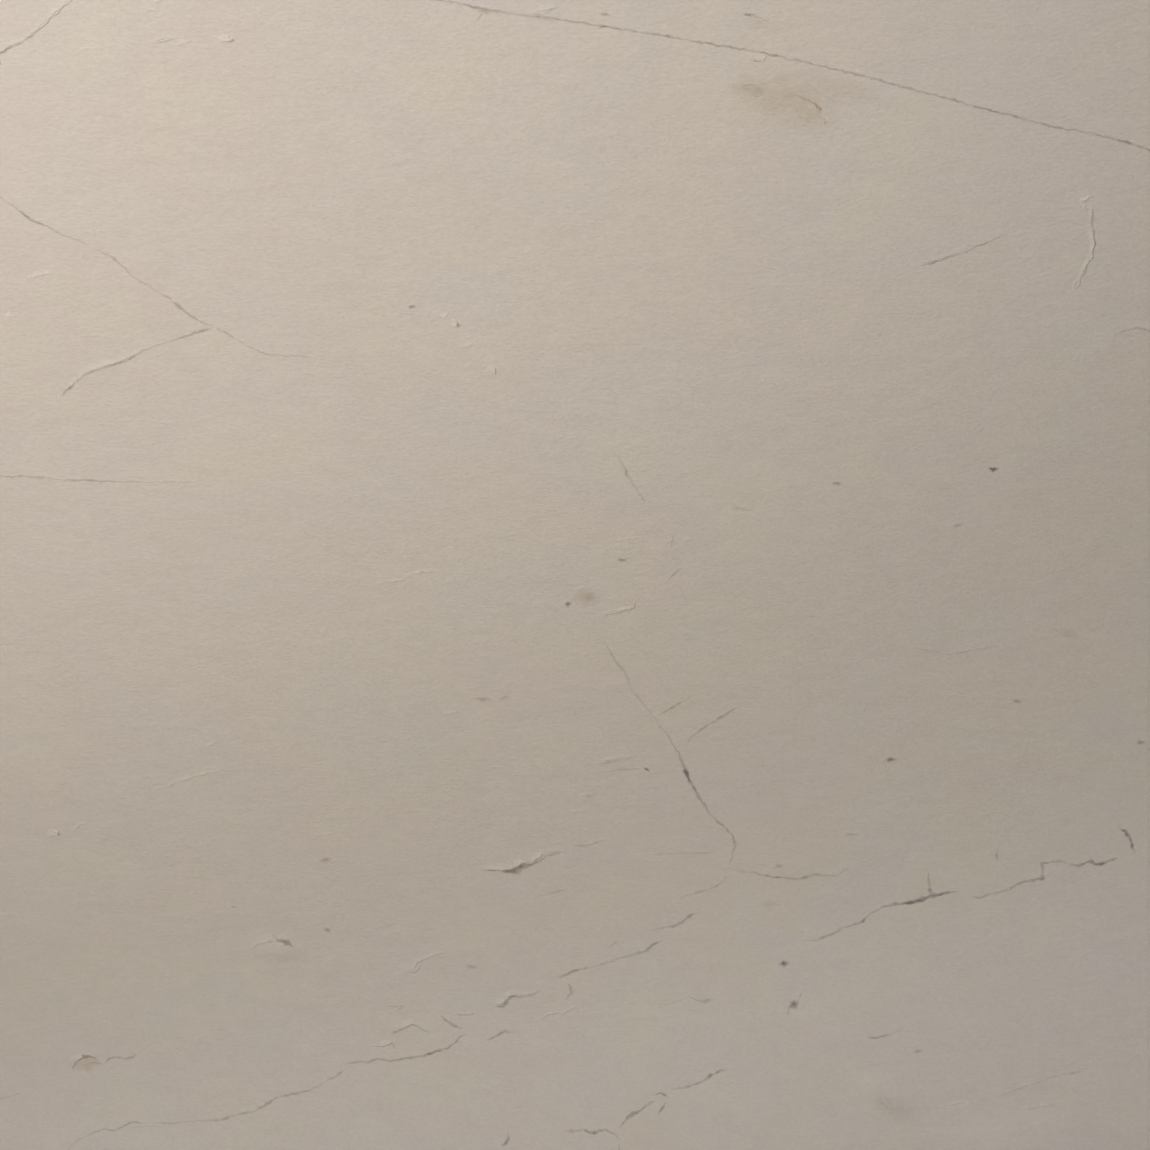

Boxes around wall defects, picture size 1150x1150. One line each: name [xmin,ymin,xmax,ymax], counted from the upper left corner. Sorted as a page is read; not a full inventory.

crack [0,0,73,65]
crack [430,0,1150,152]
crack [0,195,316,401]
crack [920,233,1007,266]
peeling [477,839,605,875]
crack [557,641,849,978]
crack [800,820,1150,942]
crack [69,1069,344,1150]